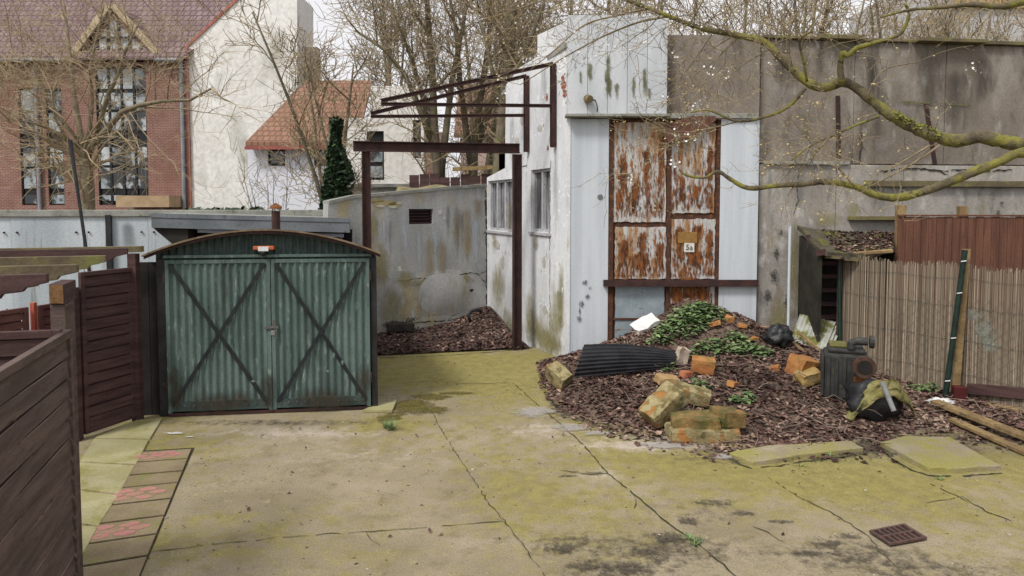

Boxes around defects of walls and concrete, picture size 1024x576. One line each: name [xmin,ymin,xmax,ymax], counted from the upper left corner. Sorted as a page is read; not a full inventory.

damp [632,69,650,98]
rust [615,116,716,218]
rust [617,224,713,304]